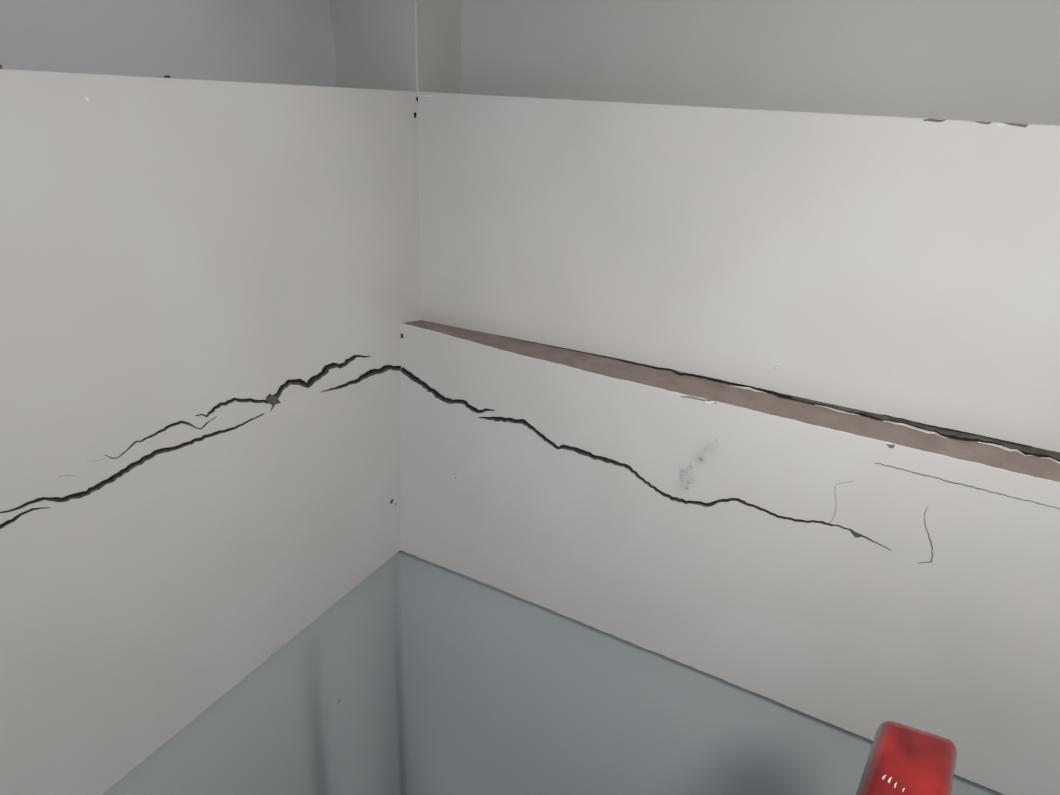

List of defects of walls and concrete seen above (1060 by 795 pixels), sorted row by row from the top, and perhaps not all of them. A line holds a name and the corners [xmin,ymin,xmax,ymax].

crack [0,355,890,550]
crack [494,334,1060,464]
crack [917,507,933,564]
crack [874,463,1060,509]